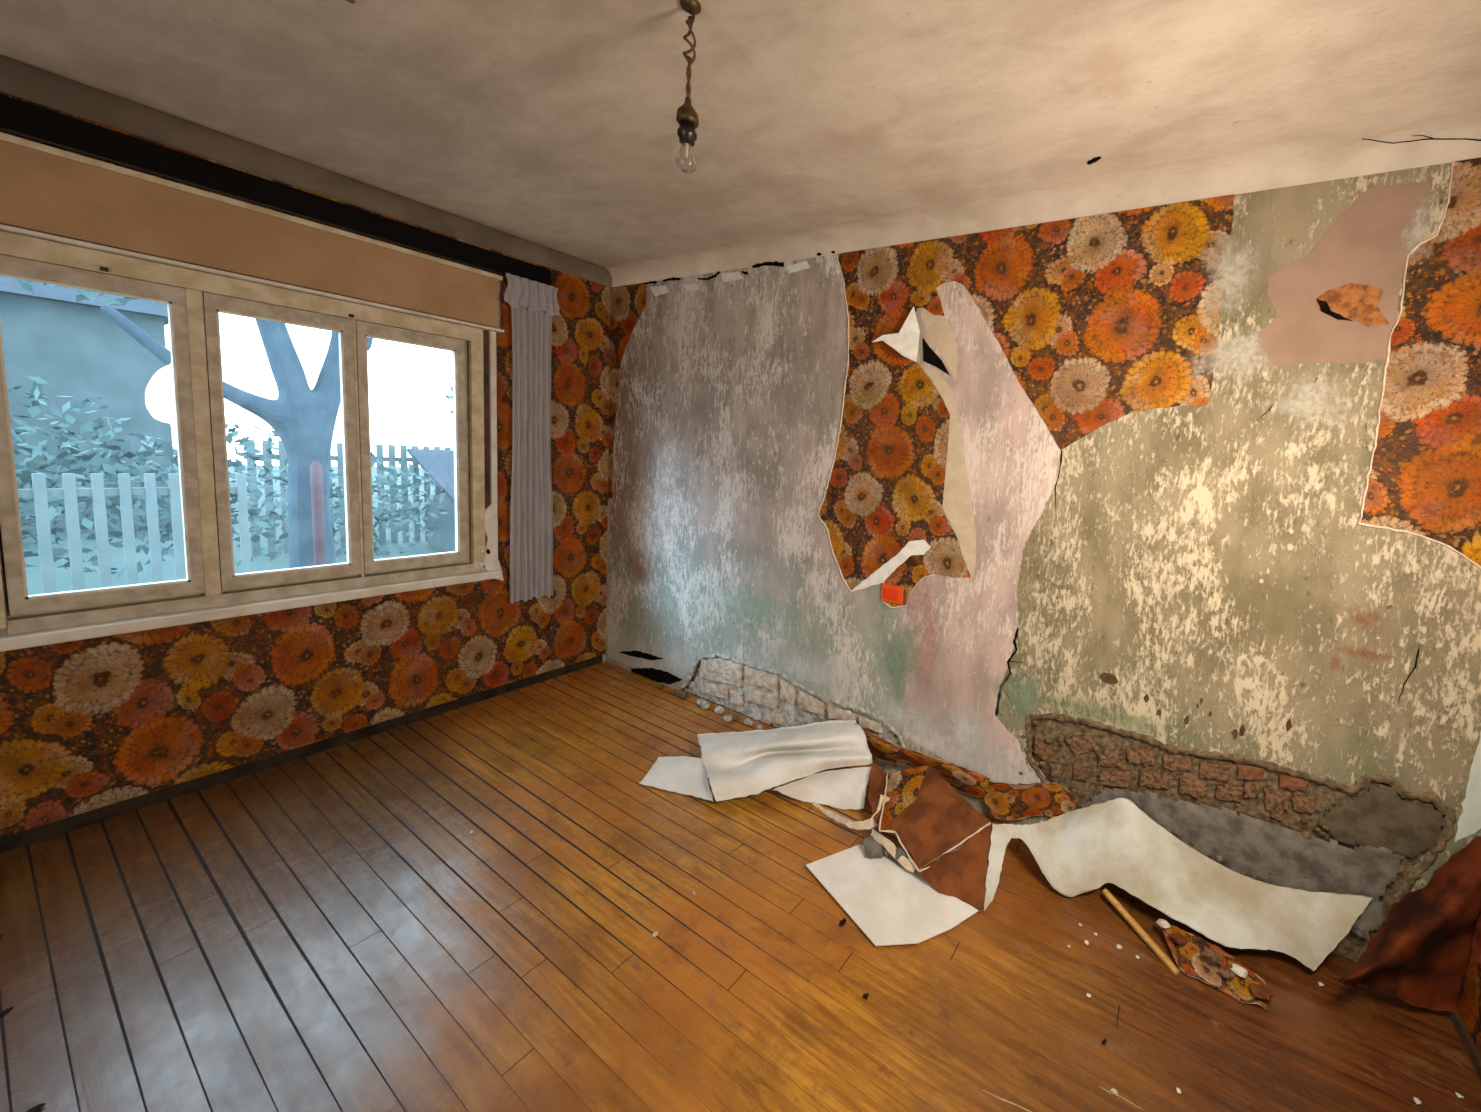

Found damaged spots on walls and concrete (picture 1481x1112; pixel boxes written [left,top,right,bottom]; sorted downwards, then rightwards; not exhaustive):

peeling [608,162,1481,1013]